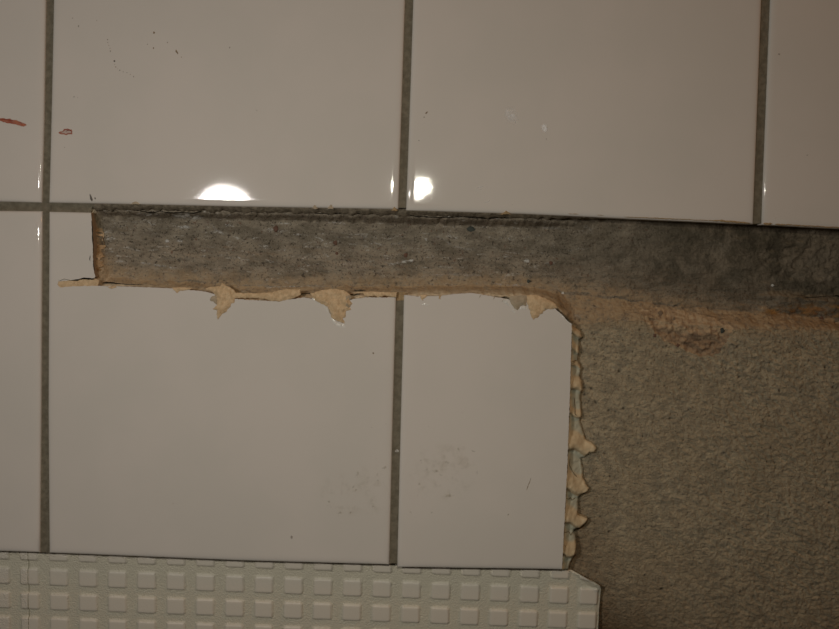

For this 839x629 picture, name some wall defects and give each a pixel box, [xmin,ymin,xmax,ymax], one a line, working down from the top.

spalling [639,306,734,357]